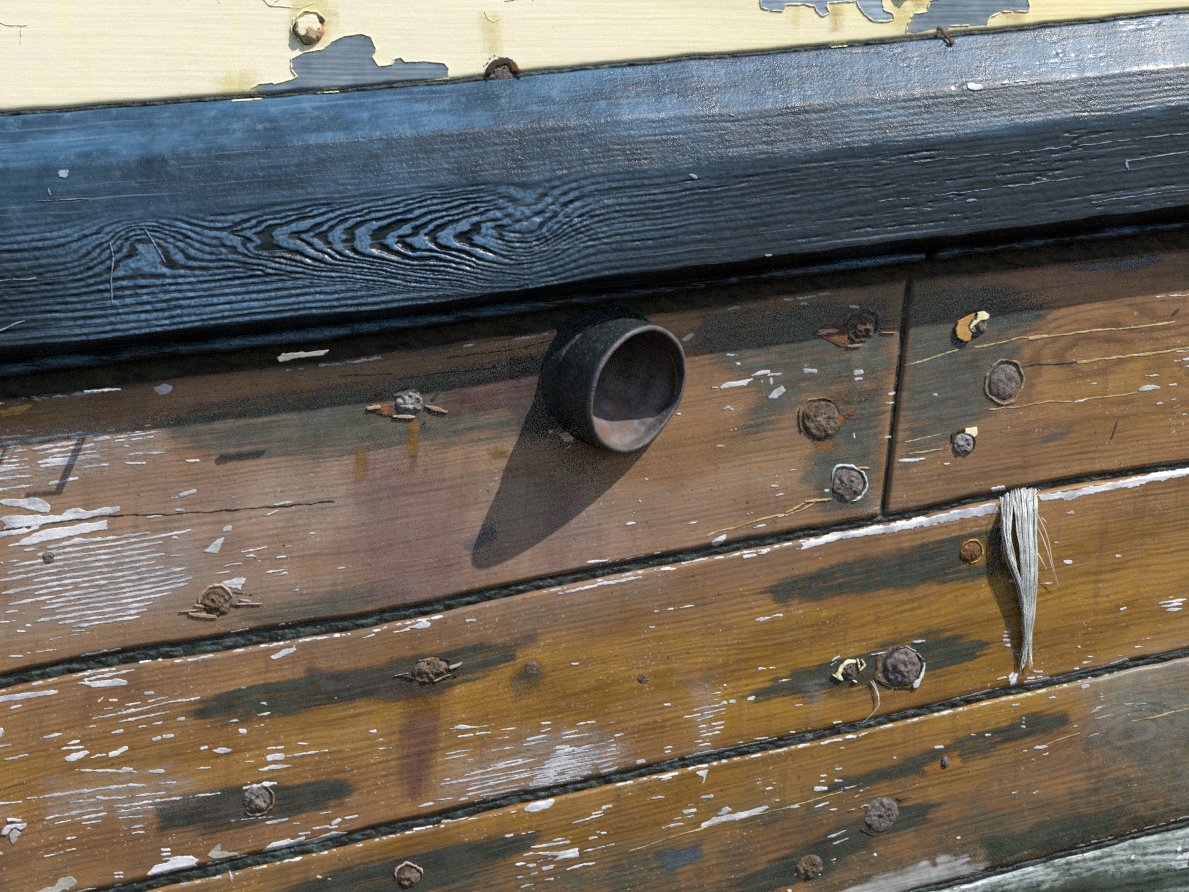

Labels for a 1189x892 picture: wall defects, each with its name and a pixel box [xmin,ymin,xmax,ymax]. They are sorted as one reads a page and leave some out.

crack [264,0,315,8]
peeling [231,33,450,101]
peeling [0,387,192,657]
crack [0,500,335,531]
peeling [232,615,443,659]
peeling [72,654,214,742]
peeling [0,733,220,836]
peeling [243,743,328,790]
peeling [356,638,1189,847]
peeling [147,812,358,885]
peeling [505,805,614,891]
peeling [842,855,1035,892]